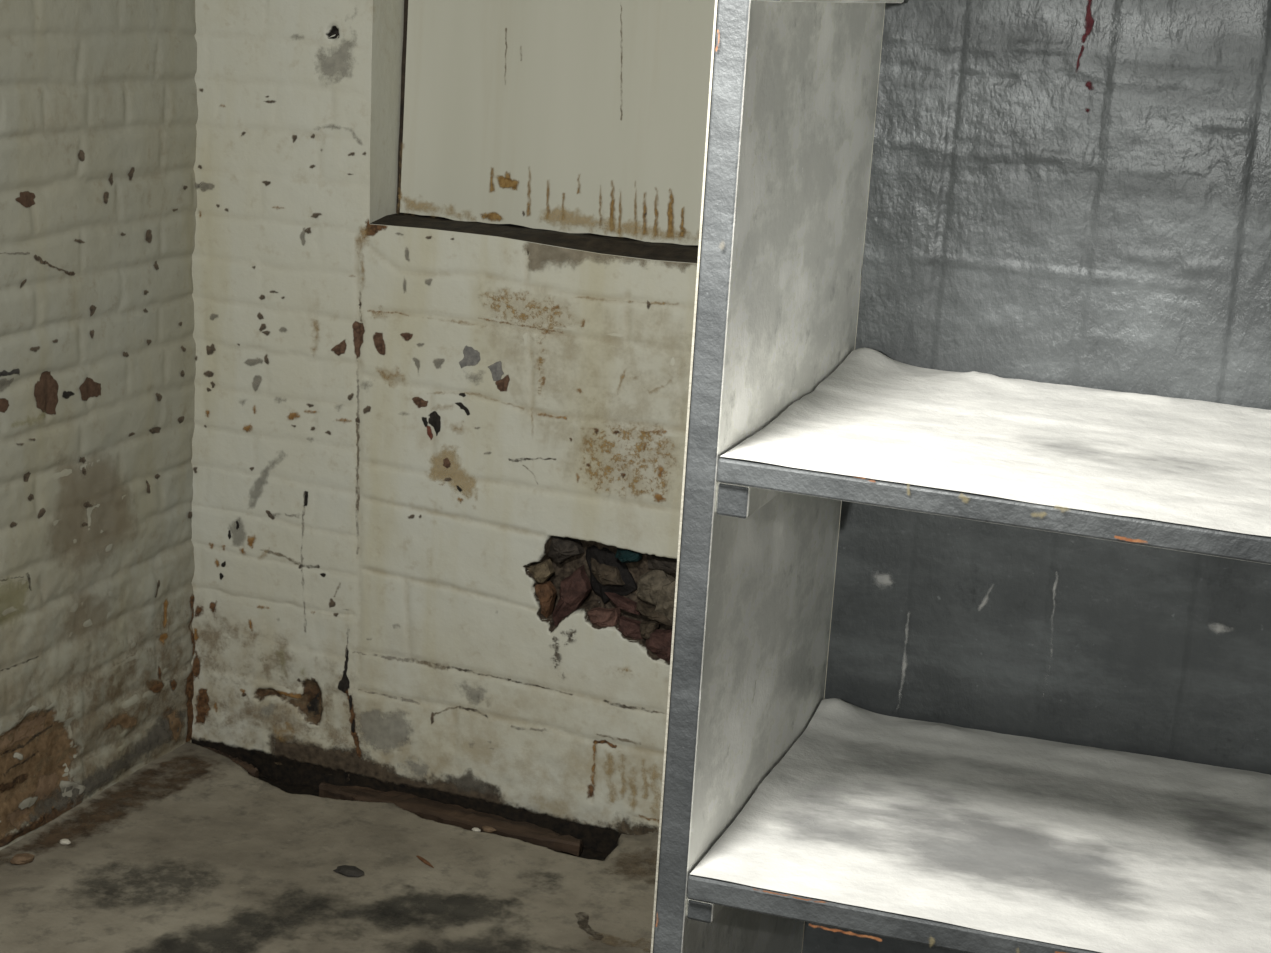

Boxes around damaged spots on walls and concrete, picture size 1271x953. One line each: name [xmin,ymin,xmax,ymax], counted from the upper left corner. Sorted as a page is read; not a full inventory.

rust [481,212,502,221]
rust [490,168,530,216]
rust [545,179,685,237]
rust [570,426,671,502]
spalling [523,536,677,665]
spalling [242,678,323,725]
spalling [0,710,85,845]
leakage [607,818,659,835]
leakage [87,865,208,907]
leakage [141,890,529,953]